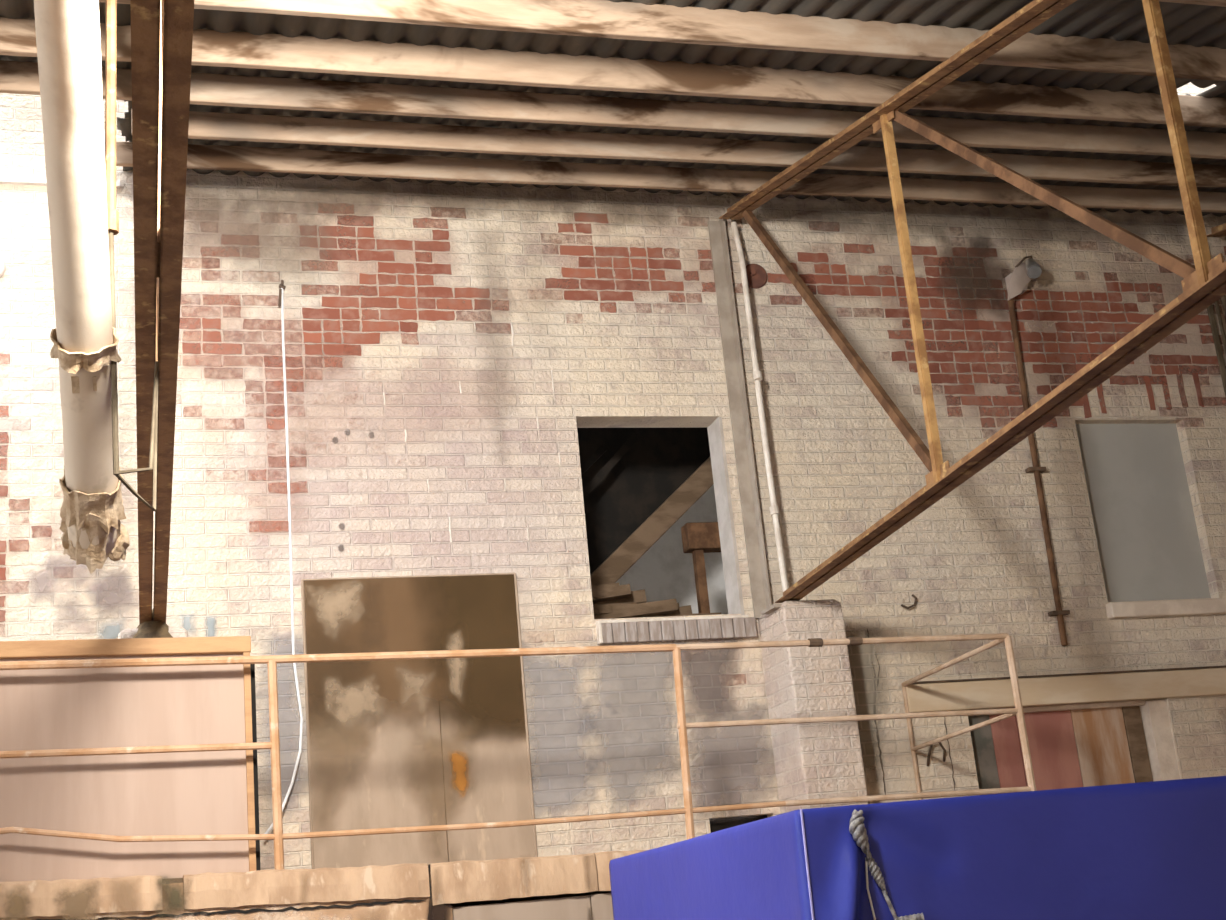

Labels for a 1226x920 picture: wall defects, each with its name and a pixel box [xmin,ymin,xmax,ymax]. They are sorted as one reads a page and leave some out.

damp [237,189,507,212]
damp [527,196,578,213]
damp [600,202,699,221]
peeling [545,212,715,313]
damp [800,210,1094,309]
peeling [179,204,511,430]
peeling [767,225,1173,428]
peeling [1043,299,1226,428]
peeling [0,432,9,470]
peeling [252,456,307,494]
peeling [0,485,52,580]
crack [36,864,432,920]